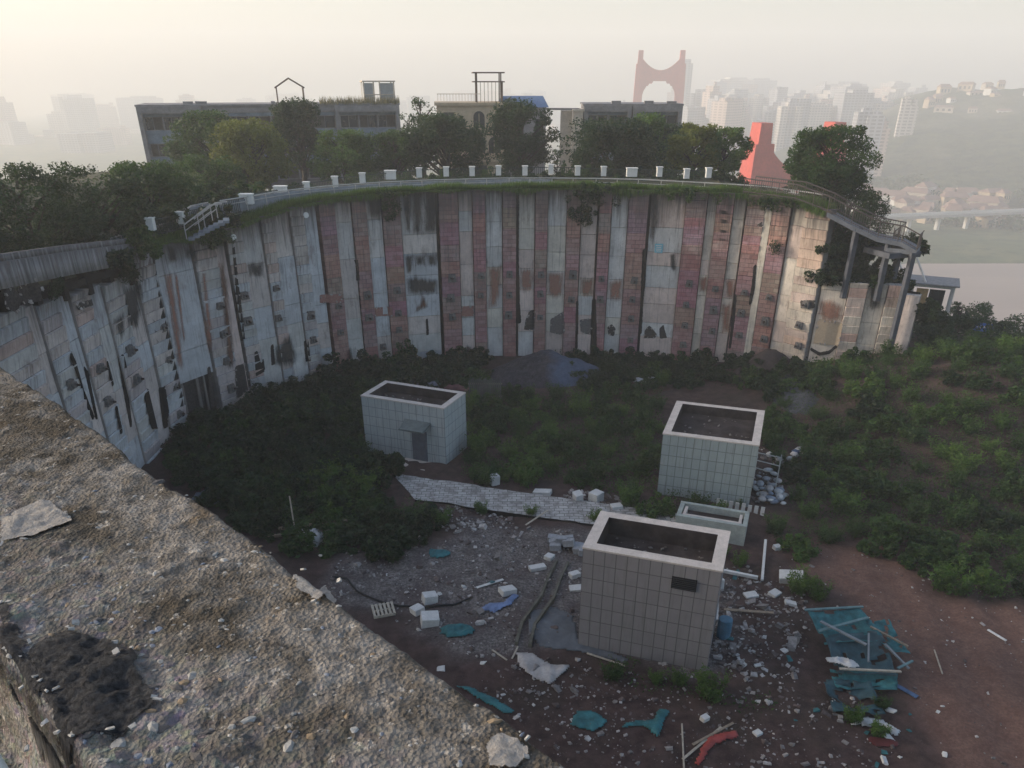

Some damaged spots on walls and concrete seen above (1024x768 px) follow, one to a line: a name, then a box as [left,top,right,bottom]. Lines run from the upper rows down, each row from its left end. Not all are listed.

leakage [406,254,437,293]
rust [167,275,185,366]
spalling [524,310,536,331]
spalling [549,312,565,336]
spalling [643,325,667,339]
leakage [275,337,295,365]